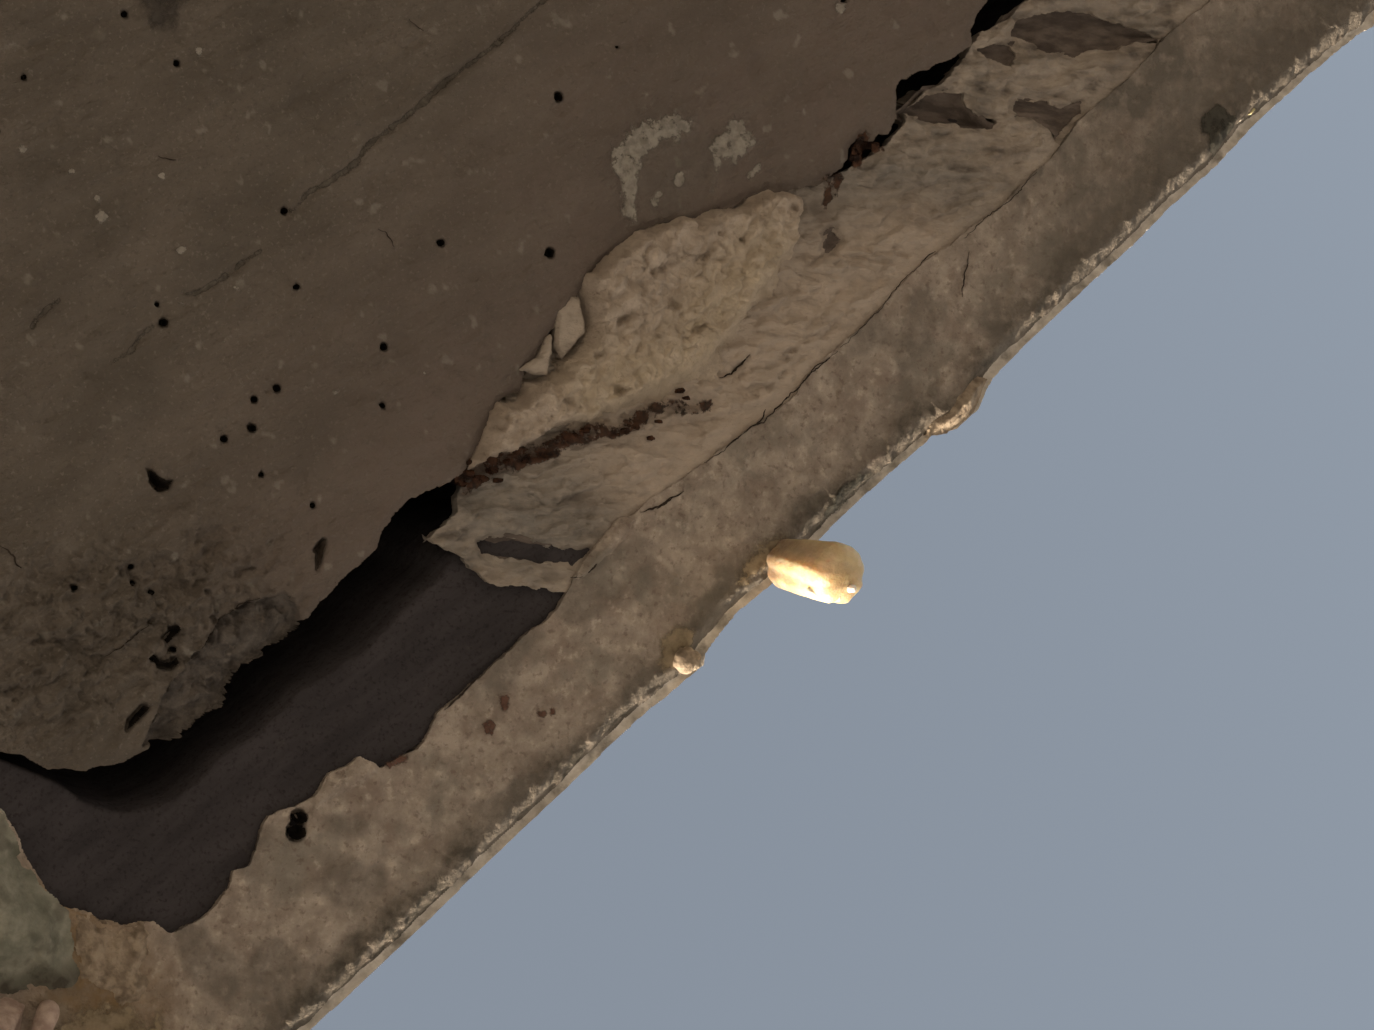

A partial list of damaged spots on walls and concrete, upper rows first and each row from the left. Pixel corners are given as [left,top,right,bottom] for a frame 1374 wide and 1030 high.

spalling [970,0,1025,37]
water stain [611,114,692,223]
water stain [708,119,761,179]
spalling [831,54,960,177]
peeling [519,297,585,375]
spalling [148,470,172,490]
corrosion [454,388,713,495]
spalling [477,540,590,566]
spalling [0,478,564,1006]